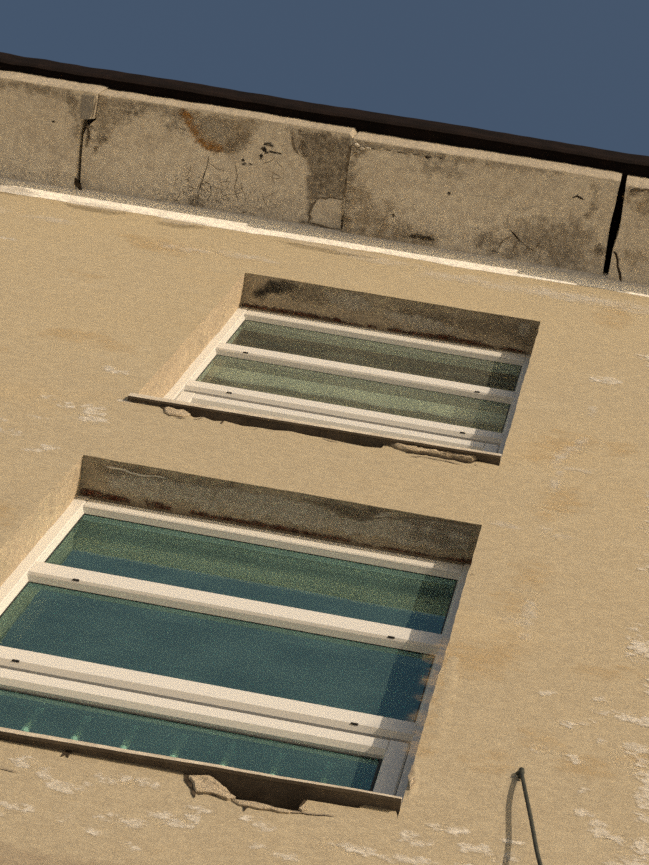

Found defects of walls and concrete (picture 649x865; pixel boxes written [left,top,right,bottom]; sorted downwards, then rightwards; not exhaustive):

crack [74,178,82,190]
crack [175,137,323,219]
water stain [299,130,349,207]
flaking render [307,197,343,229]
crack [613,251,622,281]
flaking render [390,442,478,465]
rust [80,489,130,503]
rust [190,510,472,564]
flaking render [98,774,335,831]